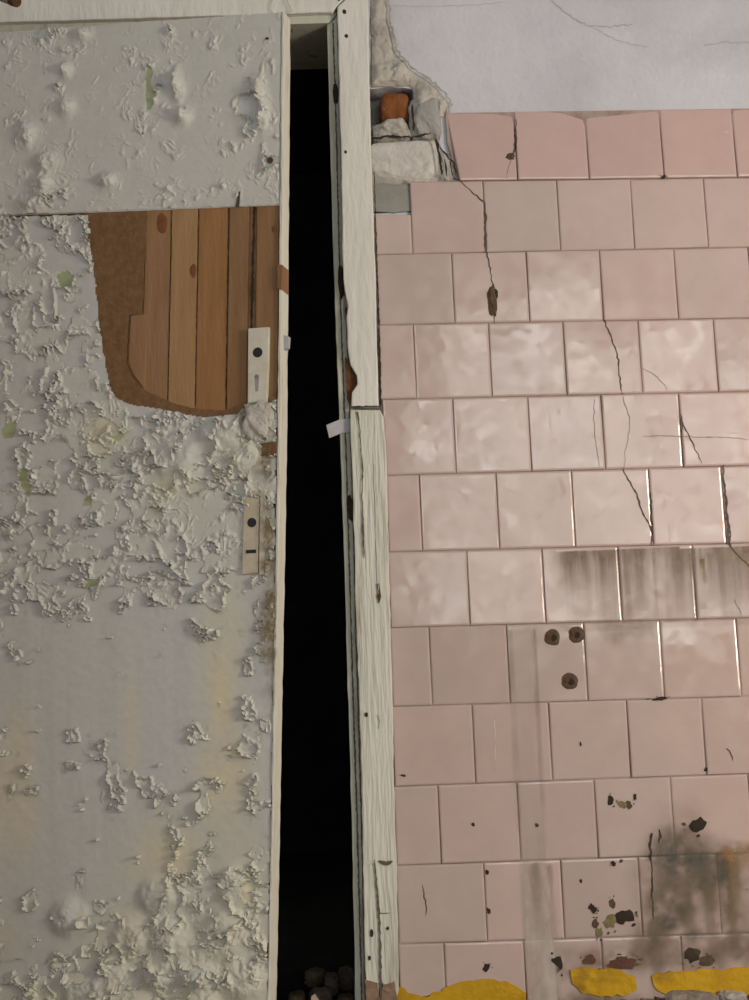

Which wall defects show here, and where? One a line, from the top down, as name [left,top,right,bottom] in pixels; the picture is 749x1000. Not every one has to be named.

flaking render [370,0,457,214]
crack [505,121,517,173]
crack [454,177,498,324]
crack [603,320,749,567]
water stain [563,547,696,577]
water stain [642,837,738,947]